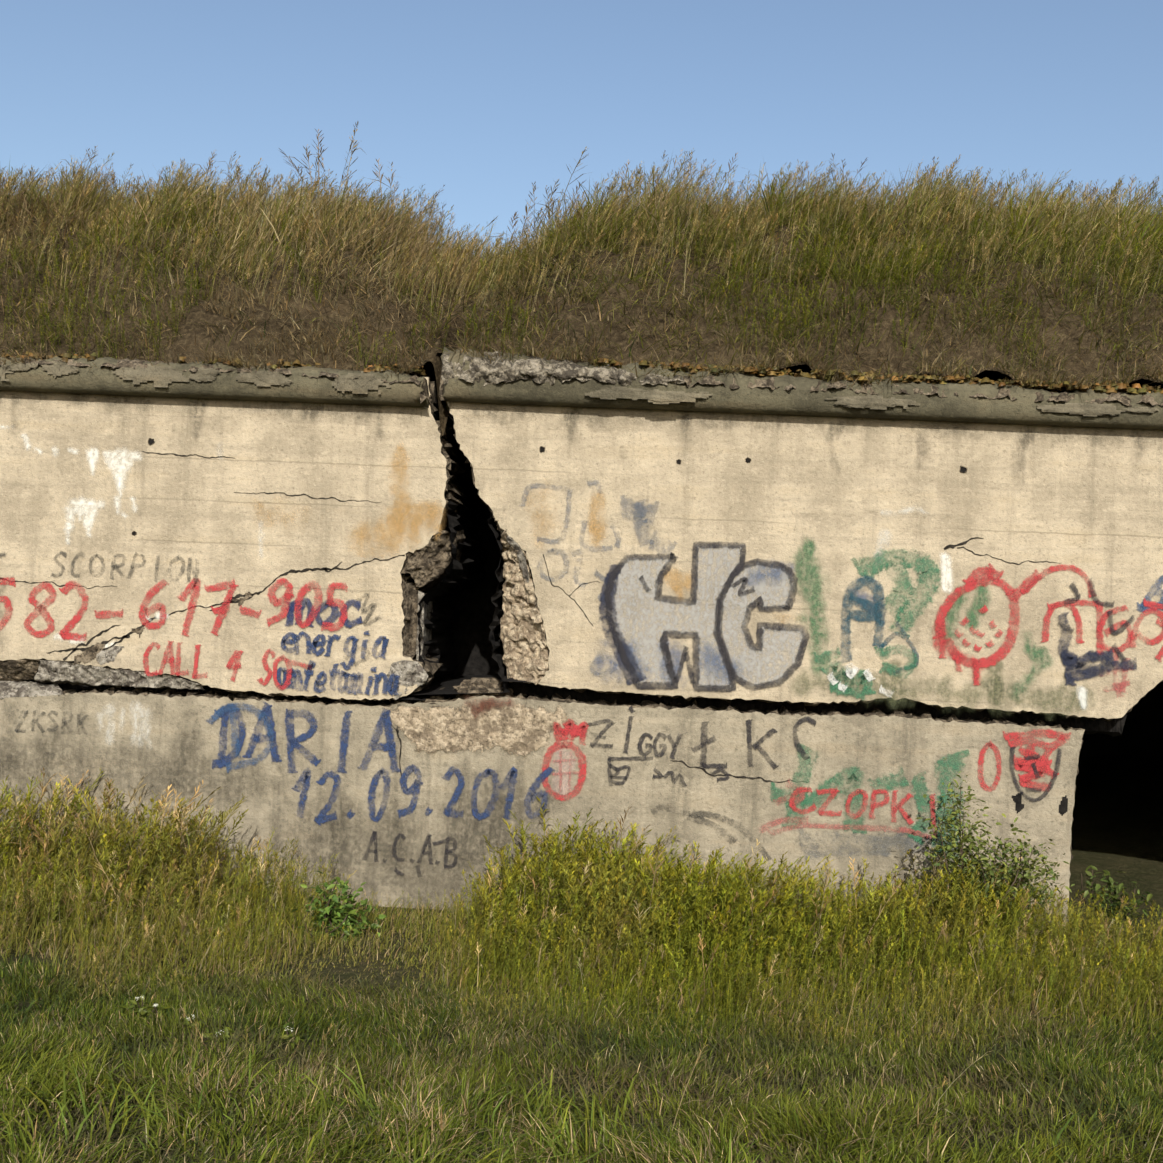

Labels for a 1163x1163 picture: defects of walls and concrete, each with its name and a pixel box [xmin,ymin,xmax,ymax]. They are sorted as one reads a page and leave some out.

flaking render [0,356,421,394]
spalling [441,351,1163,416]
leakage [72,449,140,517]
leakage [67,500,102,541]
crack [0,578,117,589]
crack [23,353,1127,775]
spalling [386,660,575,757]
crack [670,760,808,783]